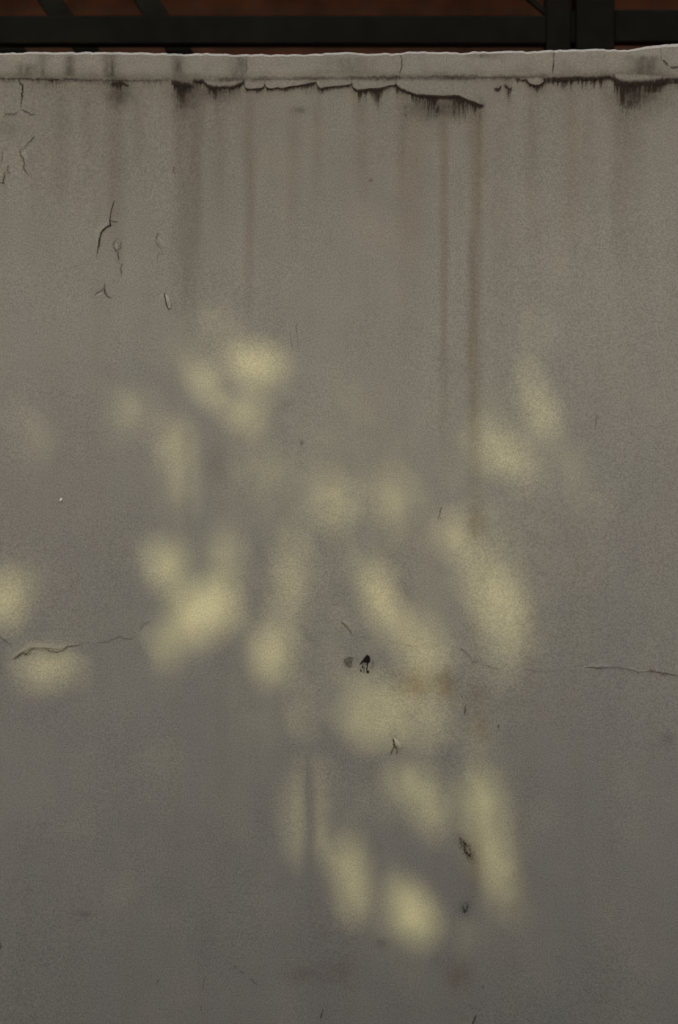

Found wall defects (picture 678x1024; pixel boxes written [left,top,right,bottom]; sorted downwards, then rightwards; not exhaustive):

peeling [197,77,486,106]
leakage [495,76,678,103]
peeling [614,73,678,83]
crack [95,206,116,251]